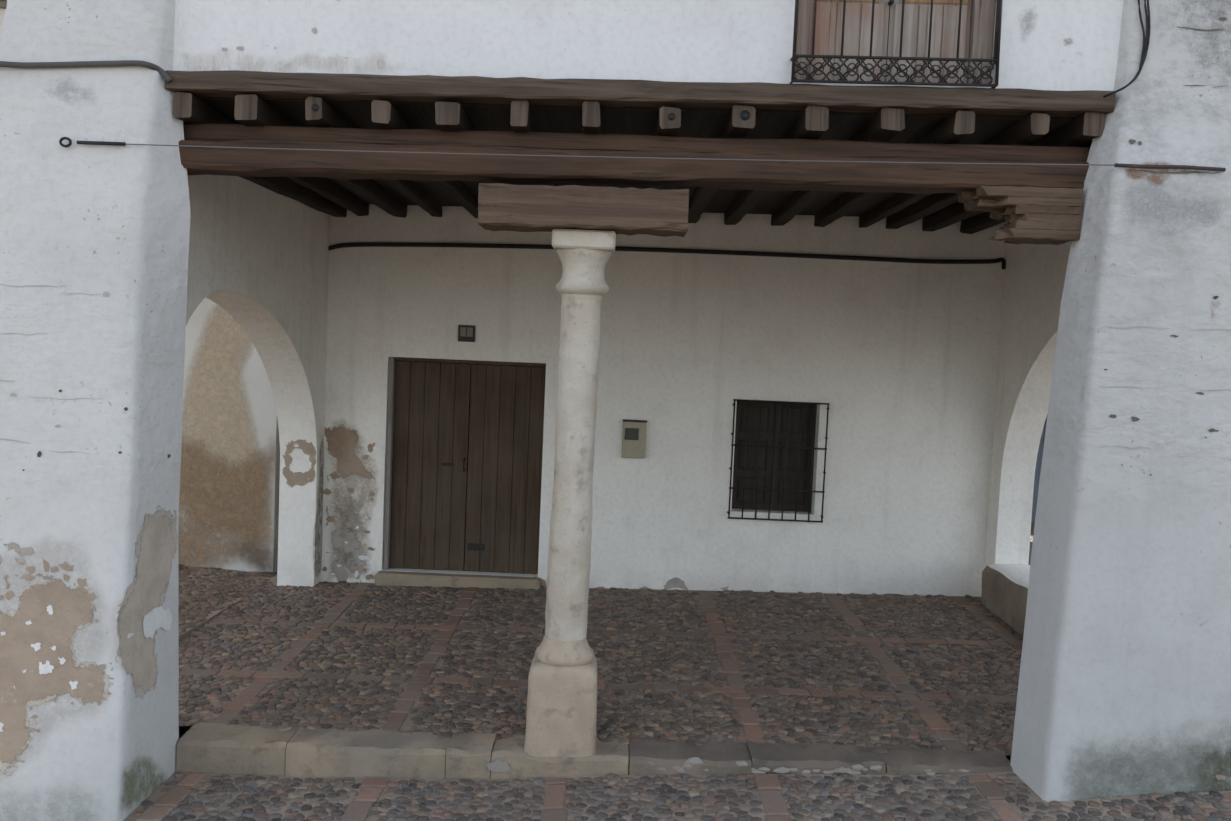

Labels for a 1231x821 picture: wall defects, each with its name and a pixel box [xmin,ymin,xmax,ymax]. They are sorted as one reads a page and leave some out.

peeling [283,424,375,583]
peeling [0,505,178,776]